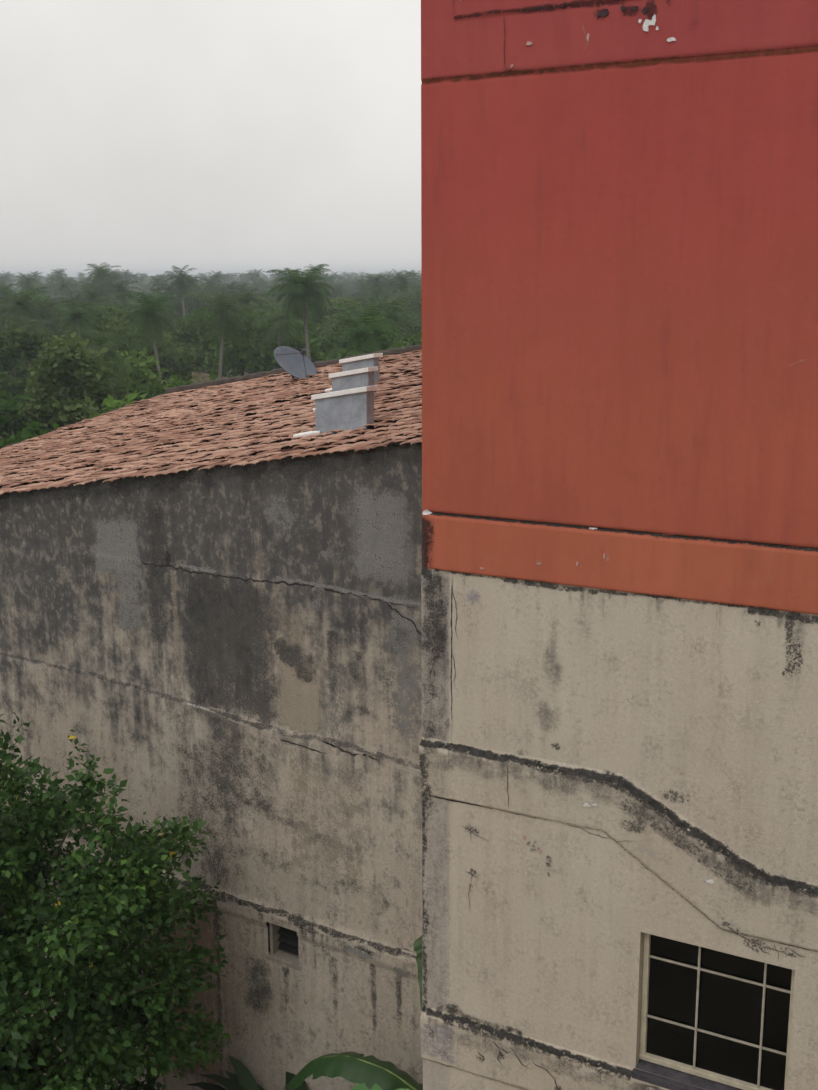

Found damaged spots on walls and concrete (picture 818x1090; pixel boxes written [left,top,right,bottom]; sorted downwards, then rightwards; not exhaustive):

peeling [595,0,676,42]
crack [93,550,421,634]
crack [450,587,458,739]
water stain [0,442,818,1090]
crack [434,766,818,962]
crack [432,1041,561,1090]